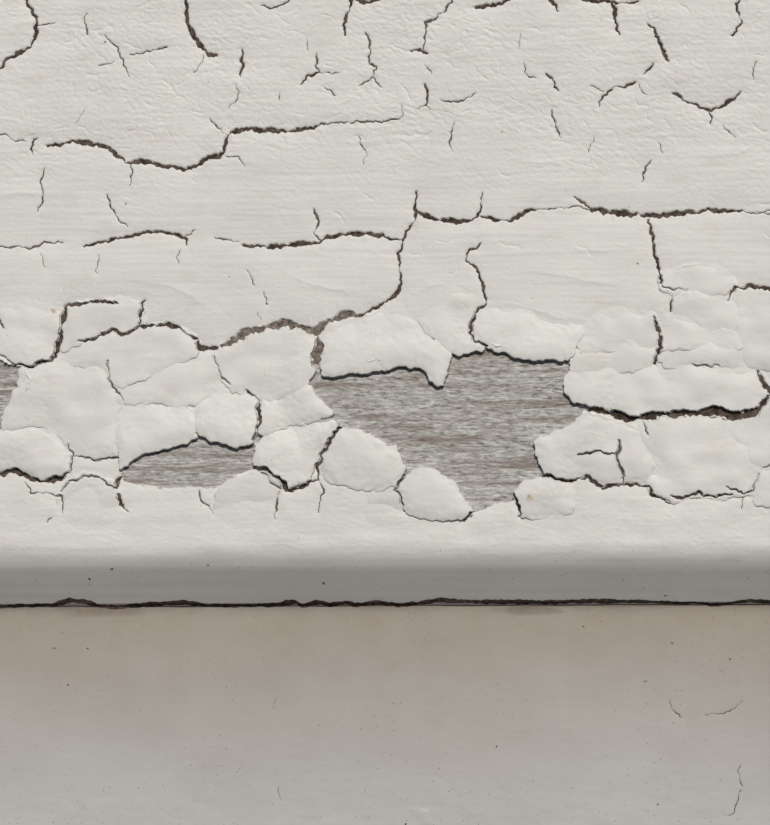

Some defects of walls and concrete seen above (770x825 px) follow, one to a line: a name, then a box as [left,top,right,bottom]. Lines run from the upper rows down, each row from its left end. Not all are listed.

crack [475,0,510,9]
crack [582,0,639,35]
crack [731,0,743,36]
crack [0,0,475,212]
crack [593,24,669,107]
crack [672,61,757,138]
crack [19,191,770,439]
crack [0,445,128,523]
crack [253,427,342,517]
peeling [0,288,656,522]
crack [540,371,770,509]
crack [0,597,770,609]